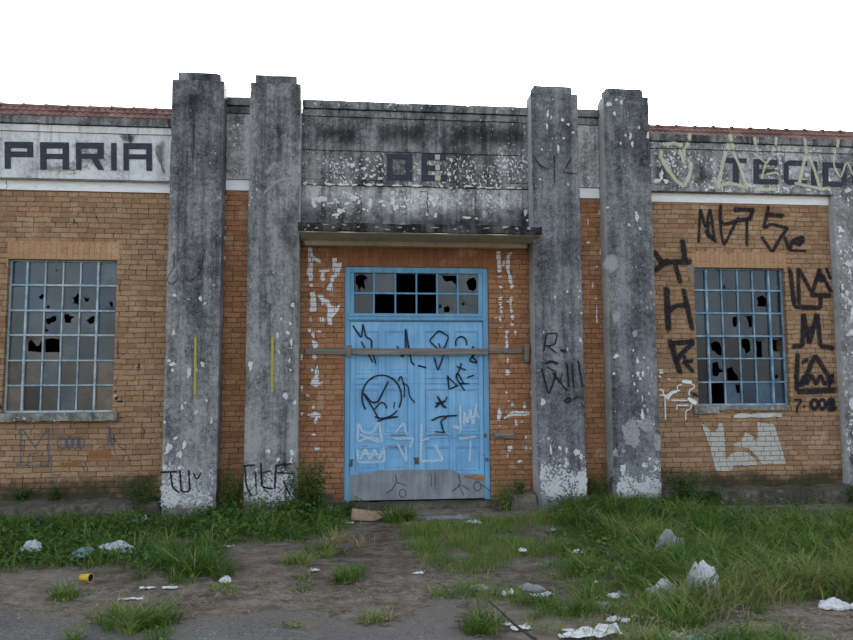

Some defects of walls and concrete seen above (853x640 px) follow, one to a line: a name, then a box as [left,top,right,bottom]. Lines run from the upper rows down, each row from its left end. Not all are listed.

leakage [382,127,421,141]
leakage [456,129,520,142]
peeling [308,157,423,229]
peeling [447,158,522,209]
peeling [301,247,342,396]
peeling [494,251,517,376]
peeling [283,393,321,436]
peeling [497,391,531,427]
peeling [612,349,662,500]
peeling [159,436,214,510]
peeling [244,449,295,507]
peeling [539,435,588,500]